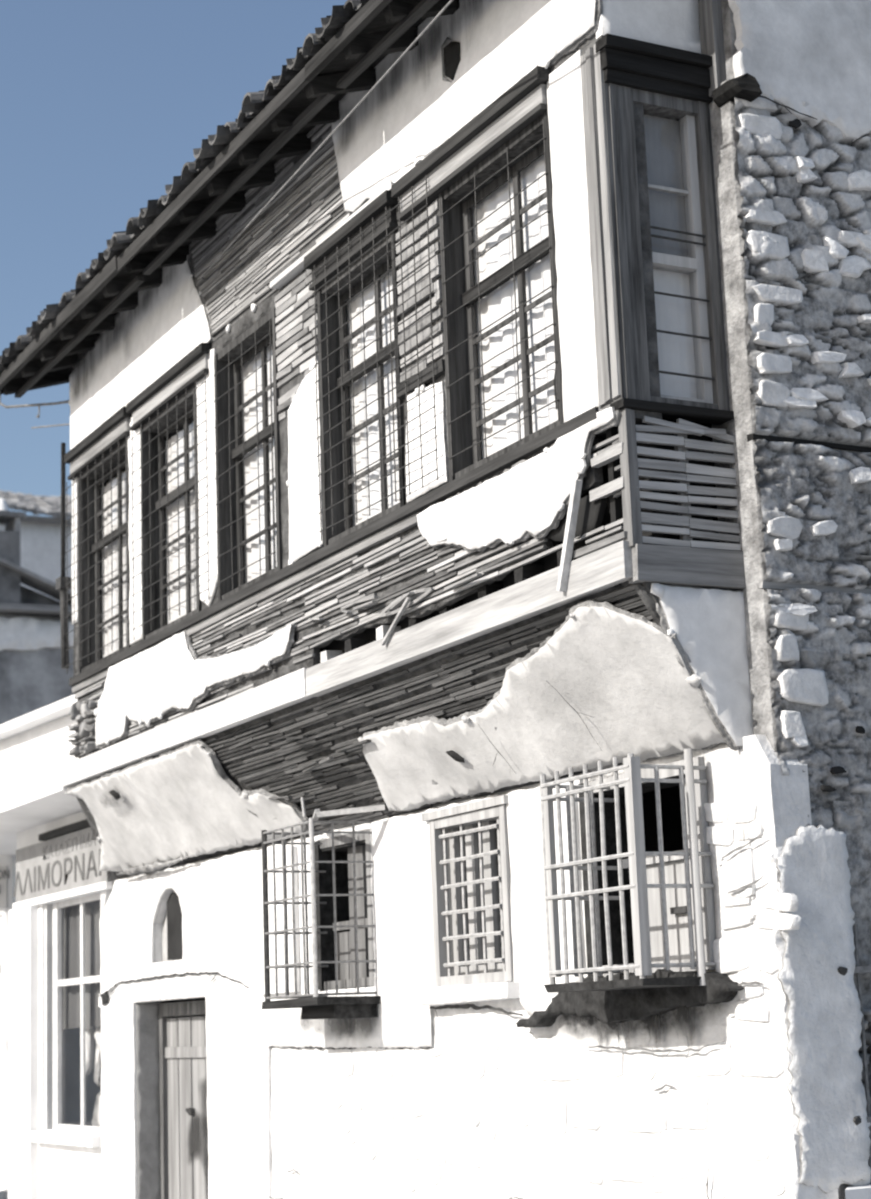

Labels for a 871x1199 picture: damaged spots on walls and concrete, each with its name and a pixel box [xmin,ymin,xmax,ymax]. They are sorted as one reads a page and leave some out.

spalling [74,199,753,758]
spalling [103,789,124,805]
spalling [204,605,590,838]
spalling [821,766,846,792]